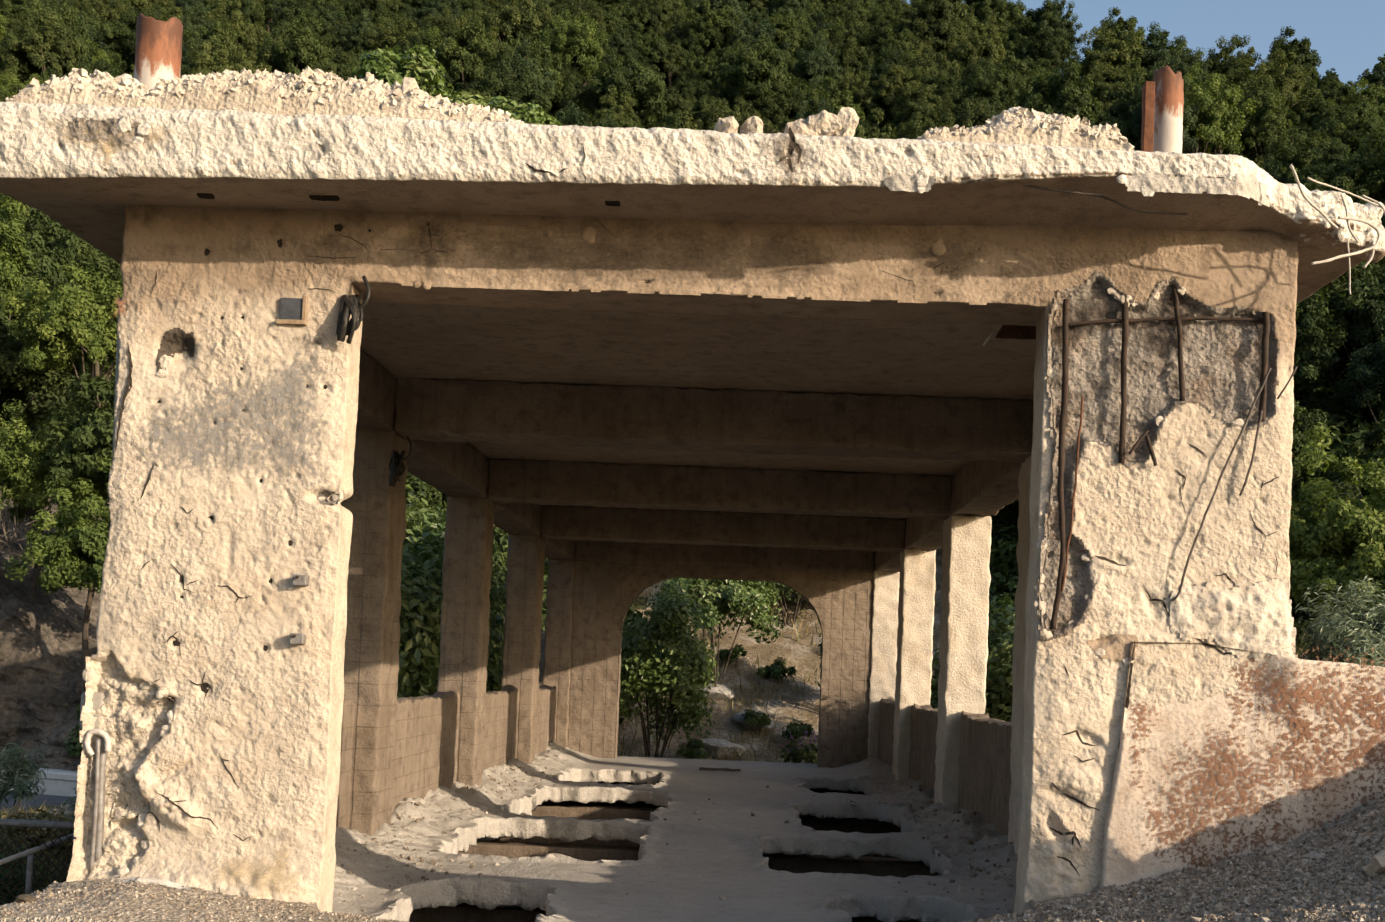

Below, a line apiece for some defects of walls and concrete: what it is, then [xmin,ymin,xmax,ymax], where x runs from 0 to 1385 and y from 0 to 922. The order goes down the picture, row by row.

crack [113,342,133,456]
crack [140,462,159,499]
spalling [155,328,195,378]
spalling [364,216,1298,667]
spalling [66,650,177,882]
rust [1123,643,1385,870]